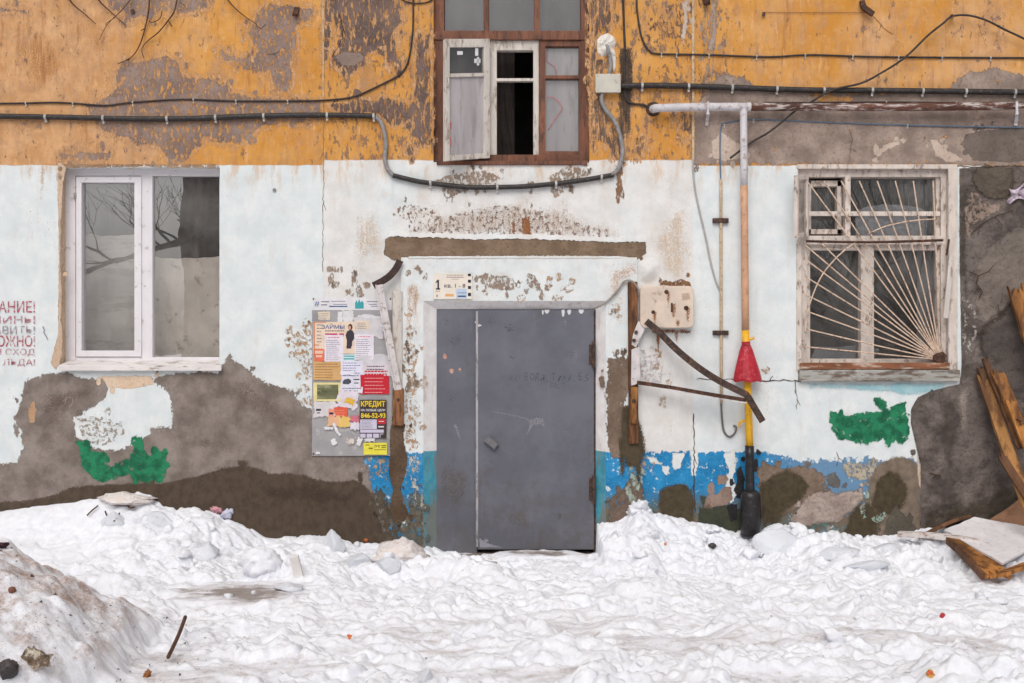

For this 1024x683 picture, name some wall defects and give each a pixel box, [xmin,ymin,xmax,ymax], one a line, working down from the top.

peeling [549,0,651,198]
peeling [0,0,437,546]
flaking render [384,165,646,280]
peeling [472,273,584,317]
flaking render [638,0,1024,536]
flaking render [605,431,699,523]